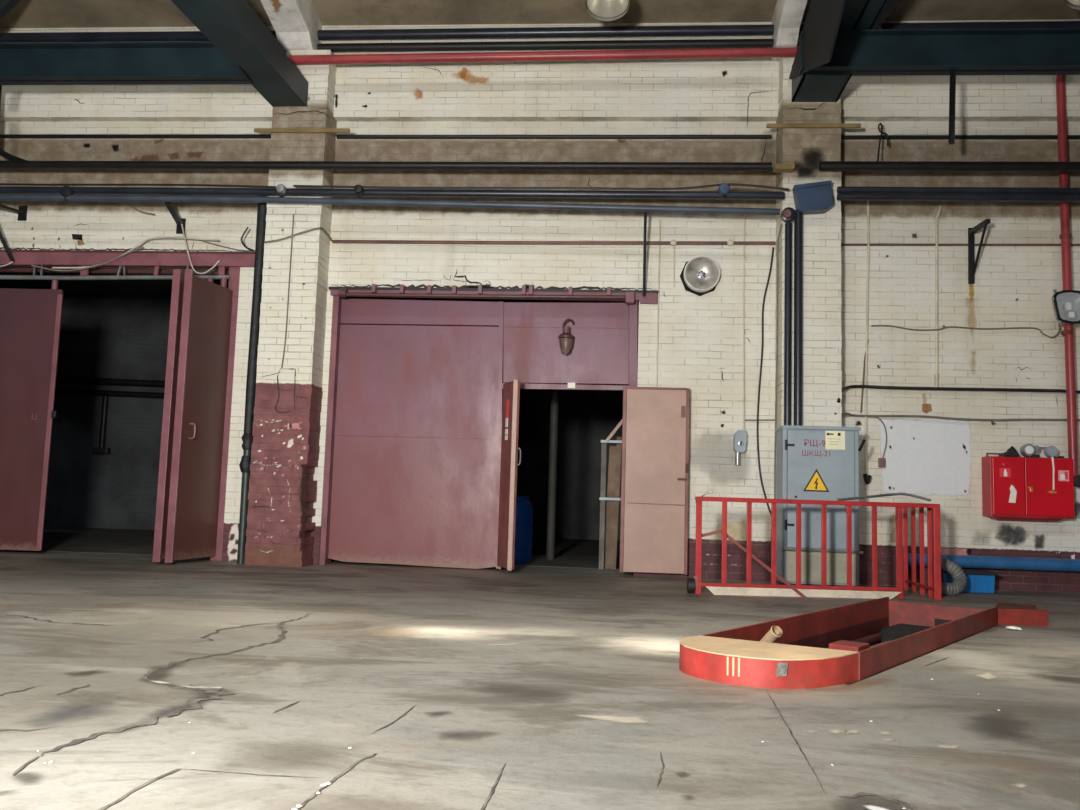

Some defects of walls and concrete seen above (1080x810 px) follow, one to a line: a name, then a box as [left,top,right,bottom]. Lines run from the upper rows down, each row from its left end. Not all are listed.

rust [458,68,487,83]
spalling [253,419,308,553]
crack [0,613,311,775]